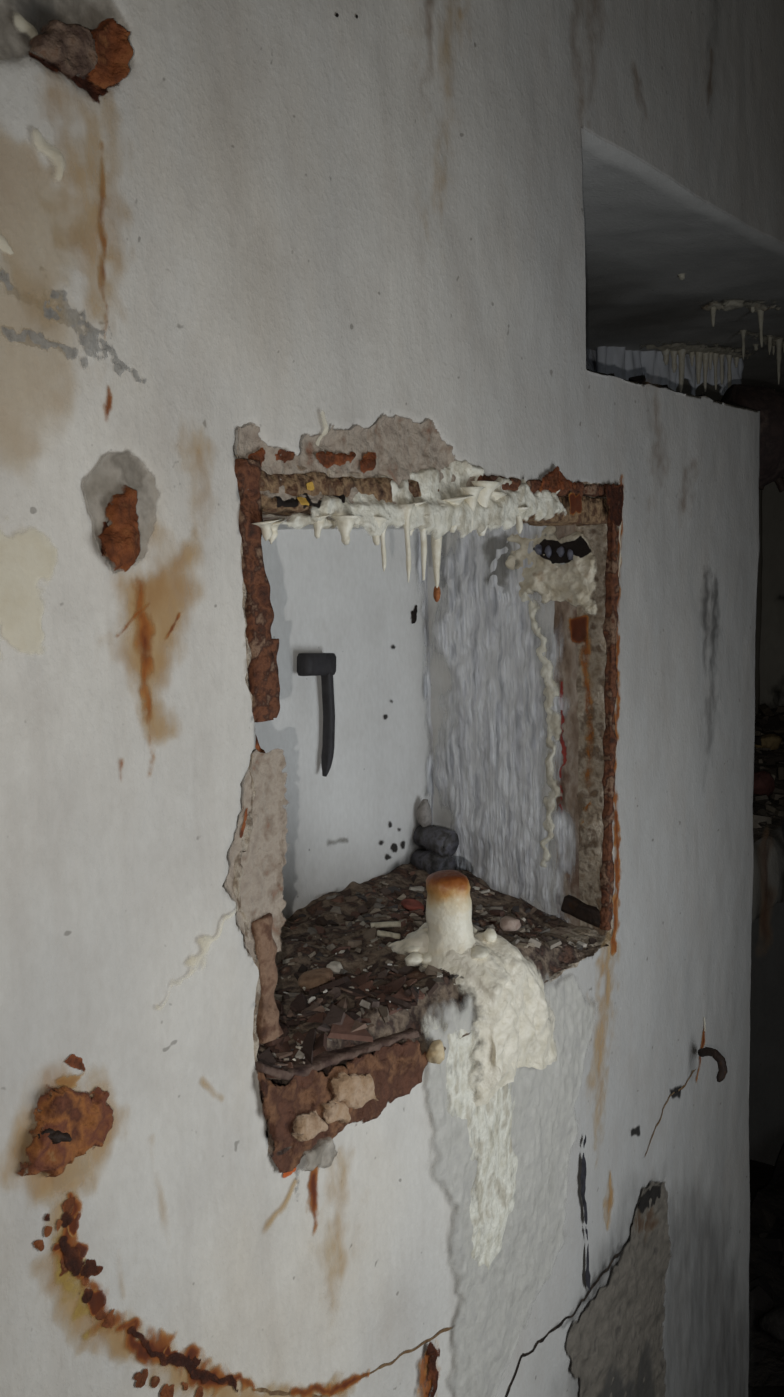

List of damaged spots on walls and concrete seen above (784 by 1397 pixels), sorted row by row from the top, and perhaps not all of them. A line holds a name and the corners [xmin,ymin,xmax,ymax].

spalling [0,0,133,103]
spalling [83,451,159,573]
spalling [237,411,476,504]
rust [124,546,195,739]
spalling [187,748,289,974]
leakage [252,460,597,1397]
rust [33,1192,455,1397]
rust [267,1166,318,1232]
crack [505,1135,633,1397]
crack [631,1070,695,1156]